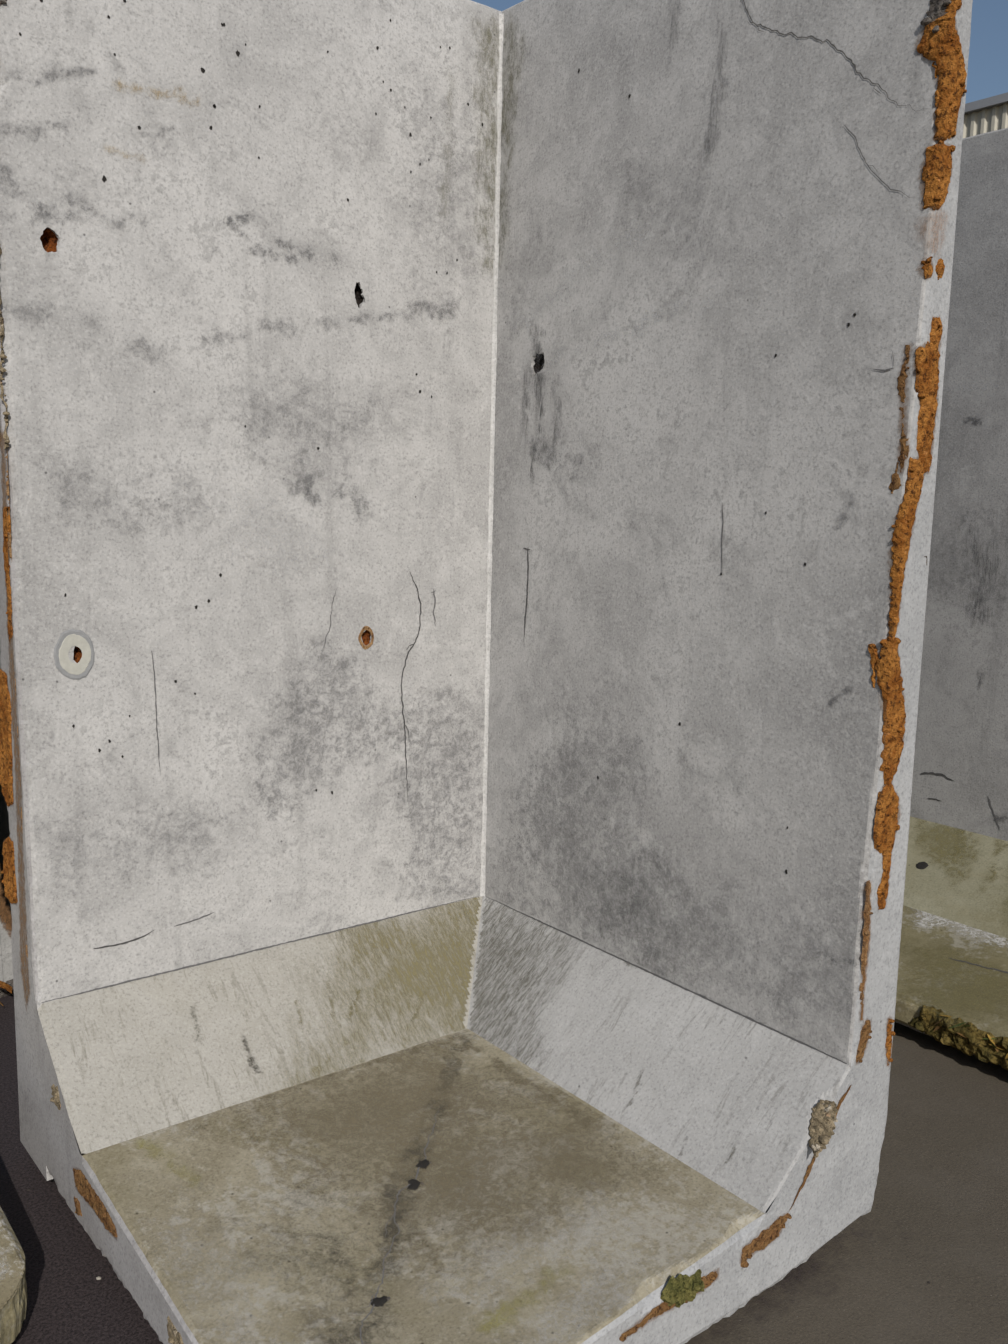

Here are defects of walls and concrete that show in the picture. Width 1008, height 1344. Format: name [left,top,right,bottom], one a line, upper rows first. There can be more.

crack [741,0,926,111]
crack [843,124,913,198]
corrosion [917,0,967,211]
corrosion [0,433,30,1004]
crack [401,573,436,802]
corrosion [856,317,943,1066]
leakage [236,897,634,1270]
spalling [808,1099,838,1158]
corrosion [73,1168,118,1238]
corrosion [741,1213,792,1268]
spalling [167,1316,184,1344]
corrosion [619,1269,718,1342]